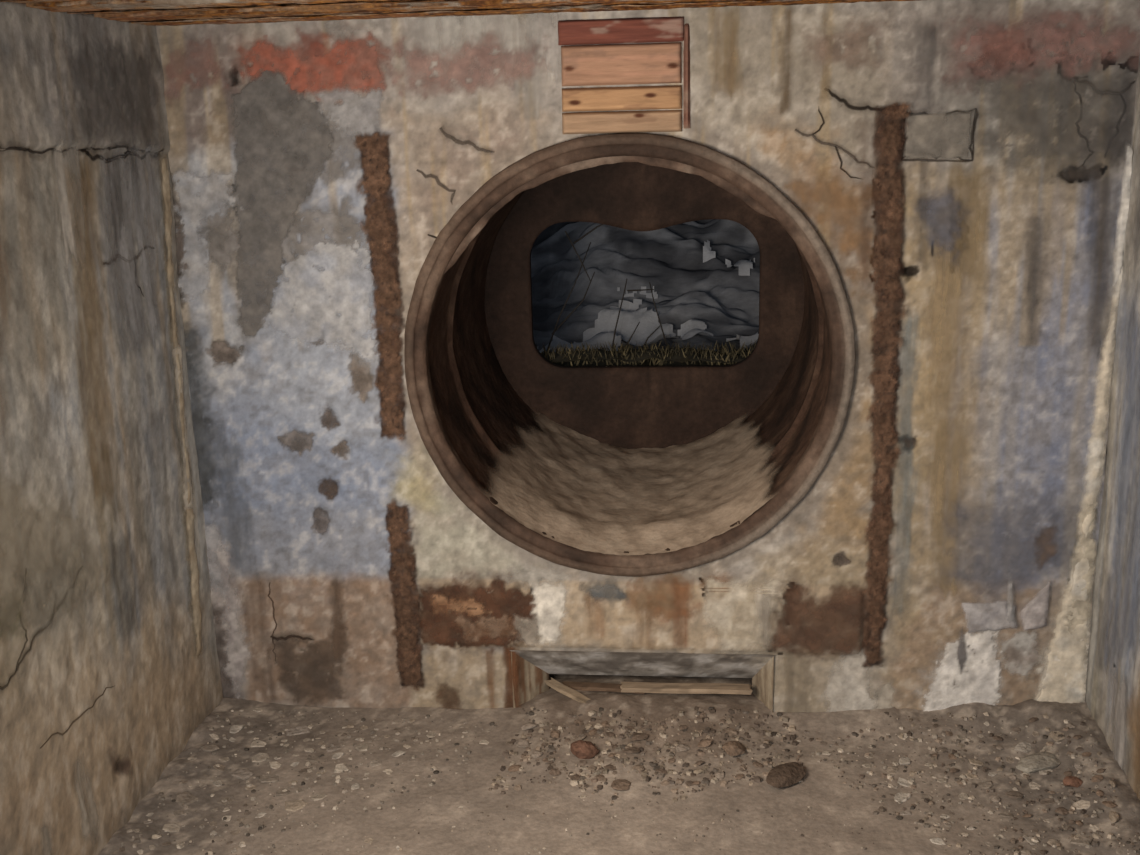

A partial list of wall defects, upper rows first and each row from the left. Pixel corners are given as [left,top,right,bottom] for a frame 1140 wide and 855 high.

crack [0,146,163,163]
crack [795,88,878,179]
crack [905,108,978,161]
peeling [165,33,534,402]
corrosion [418,579,538,709]
corrosion [774,585,869,655]